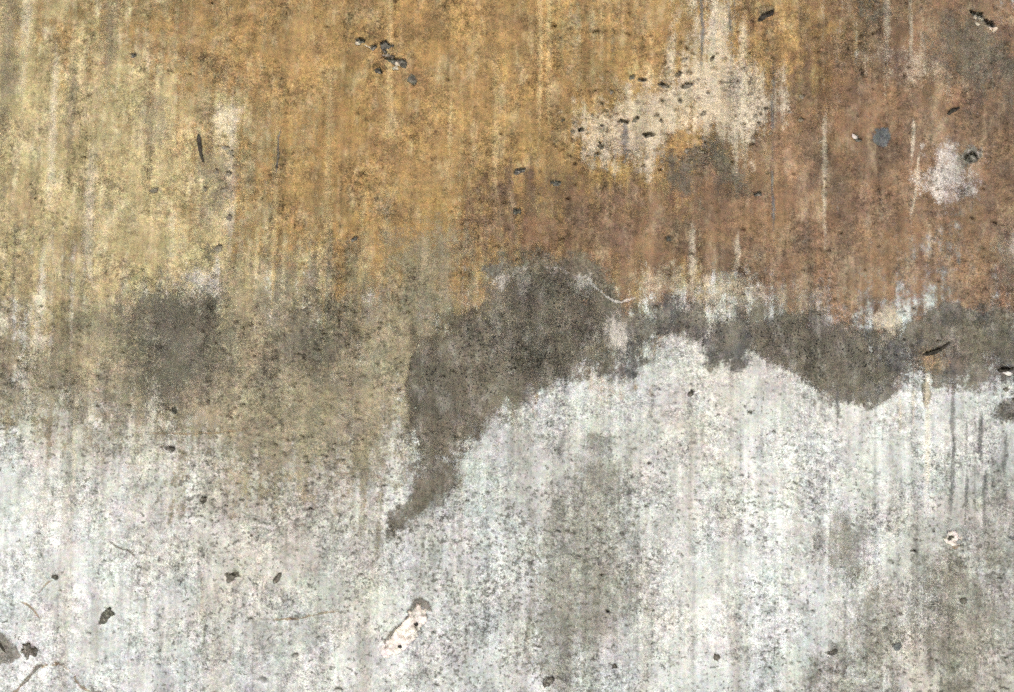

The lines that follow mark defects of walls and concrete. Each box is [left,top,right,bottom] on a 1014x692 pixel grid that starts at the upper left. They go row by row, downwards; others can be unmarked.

corrosion [35,0,886,324]
damp [0,0,1014,549]
spalling [378,597,432,658]